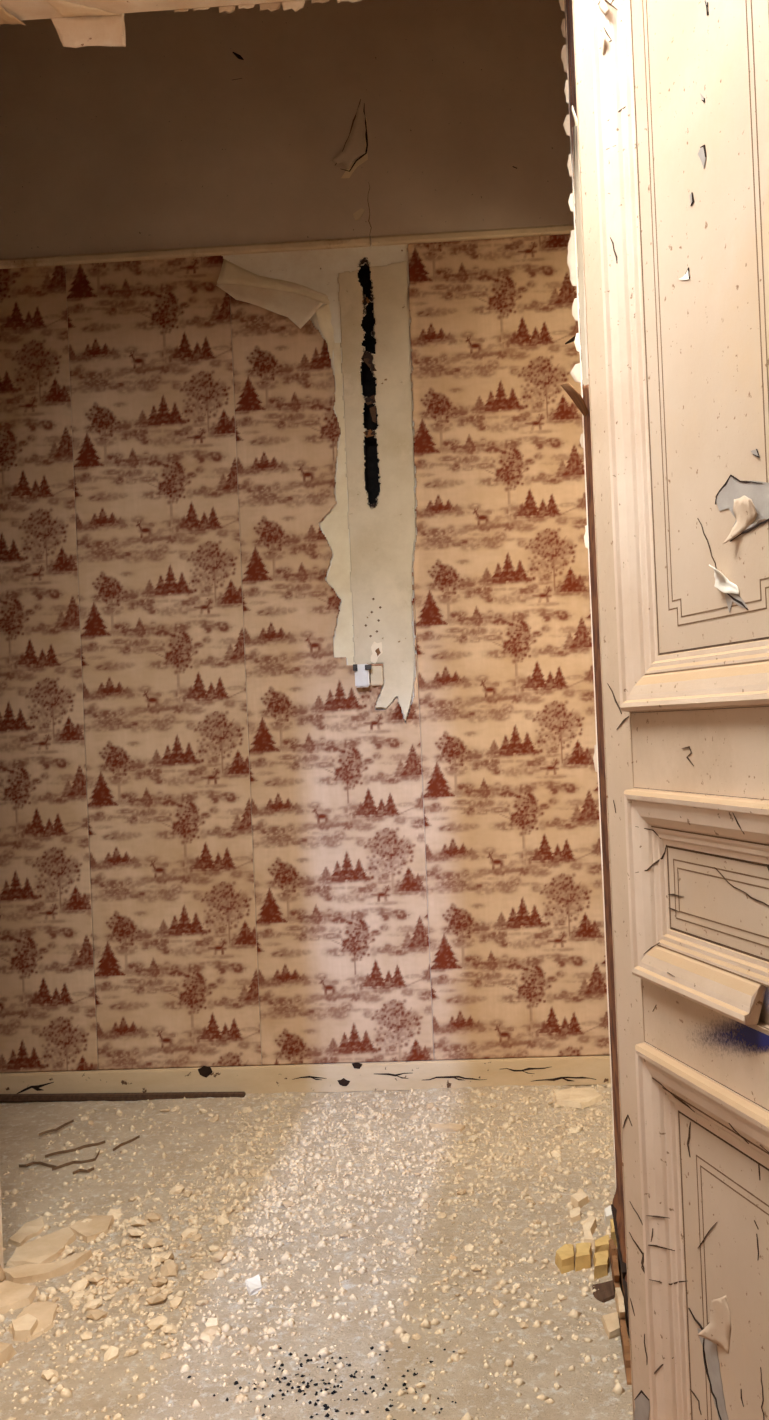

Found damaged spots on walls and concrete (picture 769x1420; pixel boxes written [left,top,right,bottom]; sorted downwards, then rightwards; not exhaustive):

peeling [174,0,362,13]
flaking render [559,0,589,386]
flaking render [223,244,409,643]
peeling [715,475,769,544]
flaking render [376,466,417,722]
peeling [709,564,748,613]
crack [607,683,629,729]
crack [613,800,684,912]
crack [714,864,769,907]
crack [652,1077,694,1157]
crack [629,1202,717,1374]
crack [741,1367,764,1420]